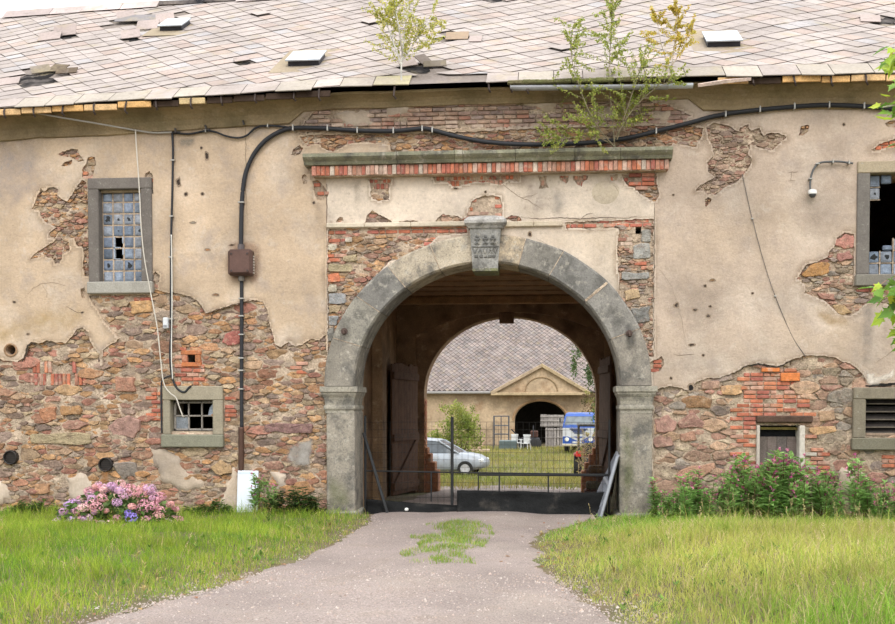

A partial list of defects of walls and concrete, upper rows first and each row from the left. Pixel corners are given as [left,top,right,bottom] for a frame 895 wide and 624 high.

spalling [31,149,96,276]
spalling [0,175,522,513]
spalling [292,100,786,206]
spalling [565,219,663,372]
spalling [797,233,889,316]
spalling [872,140,895,152]
spalling [652,355,895,518]